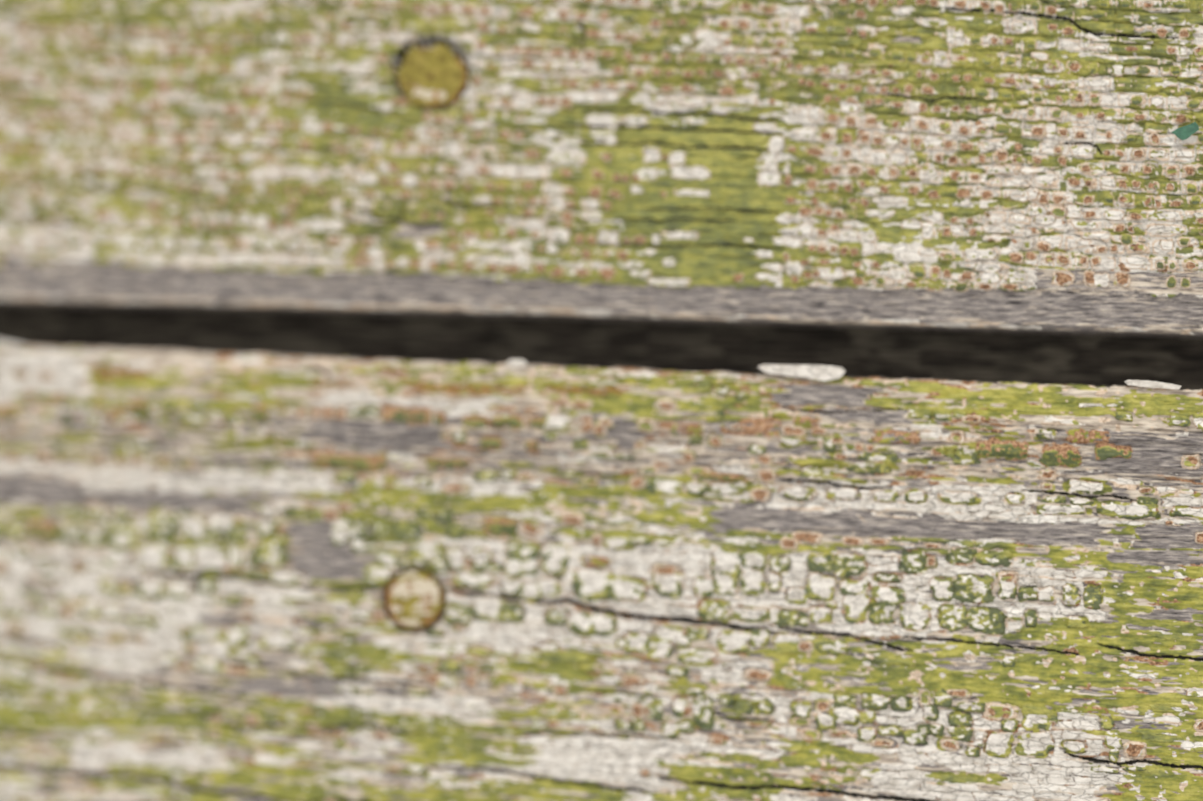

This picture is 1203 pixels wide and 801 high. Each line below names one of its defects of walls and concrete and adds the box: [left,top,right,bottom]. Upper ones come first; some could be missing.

peeling [1171,122,1199,140]
peeling [390,222,445,238]
peeling [1033,270,1203,296]
peeling [0,339,157,423]
peeling [0,354,1203,801]
crack [443,586,1203,661]
crack [28,657,433,735]
crack [0,764,287,801]